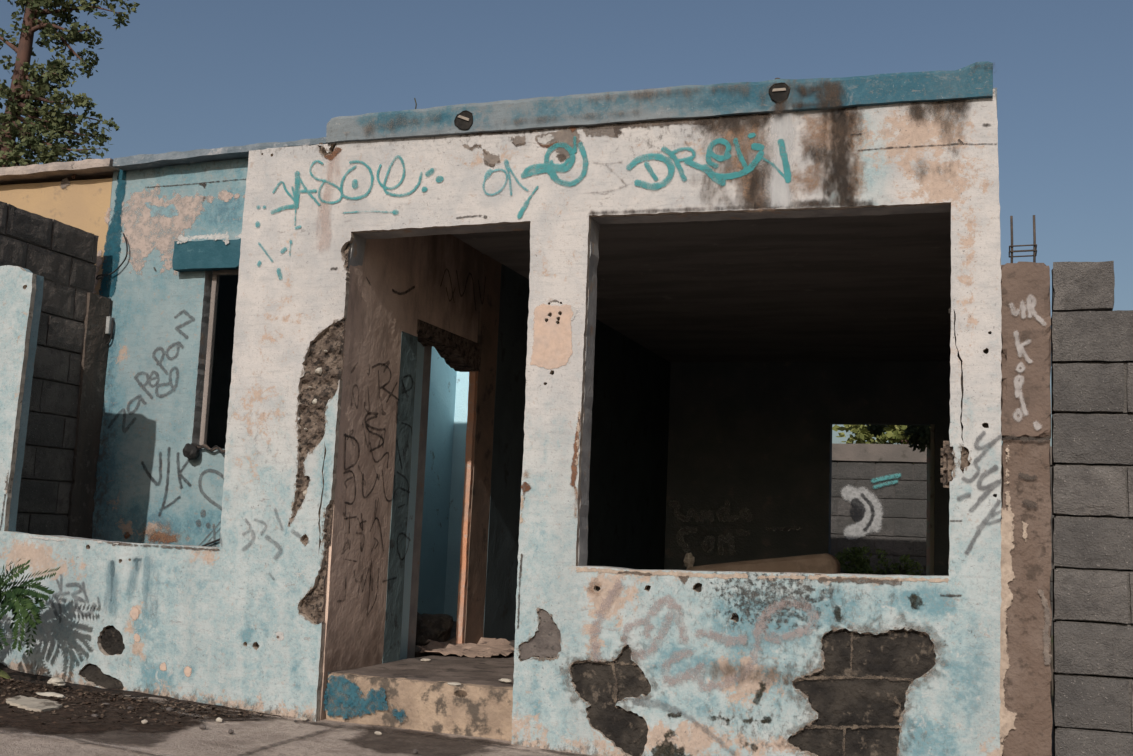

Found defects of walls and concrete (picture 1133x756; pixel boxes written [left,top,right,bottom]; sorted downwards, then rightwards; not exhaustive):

damp [910,100,967,129]
peeling [92,250,102,293]
peeling [105,184,245,274]
crack [949,307,964,443]
spalling [289,319,345,527]
spalling [940,441,972,488]
spalling [297,500,334,624]
spalling [100,606,140,655]
spalling [80,664,124,690]
spalling [519,608,651,756]
spalling [788,627,936,756]